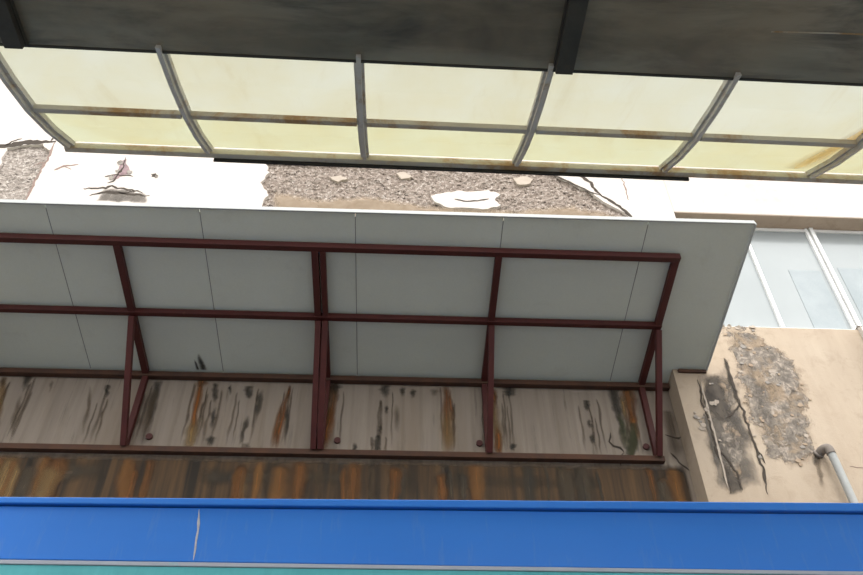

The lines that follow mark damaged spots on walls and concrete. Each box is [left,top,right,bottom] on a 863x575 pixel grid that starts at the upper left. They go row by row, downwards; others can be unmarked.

spalling [0,146,49,200]
spalling [262,164,632,219]
corrosion [798,130,863,167]
corrosion [187,380,207,444]
corrosion [272,387,293,441]
corrosion [324,384,344,444]
corrosion [443,387,455,443]
peeling [722,324,815,466]
corrosion [0,455,692,502]